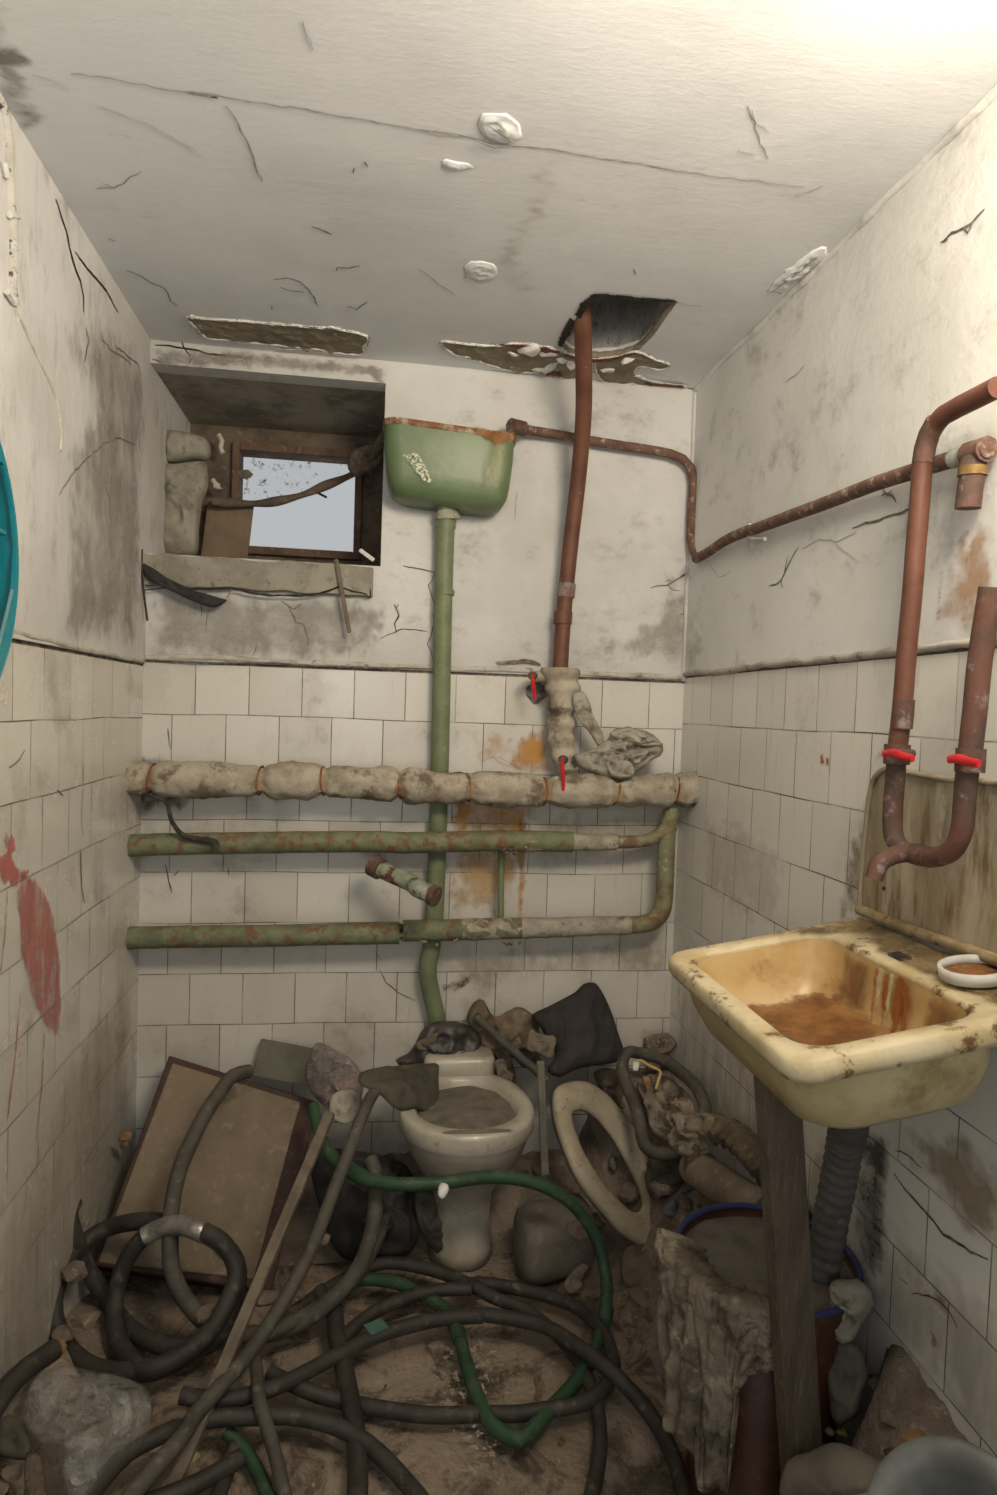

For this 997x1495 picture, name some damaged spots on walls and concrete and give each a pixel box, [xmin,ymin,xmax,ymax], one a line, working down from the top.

crack [34,73,823,196]
spalling [185,315,370,356]
spalling [439,298,687,389]
crack [769,489,909,588]
corrosion [957,537,988,619]
corrosion [513,734,545,765]
corrosion [420,803,632,948]